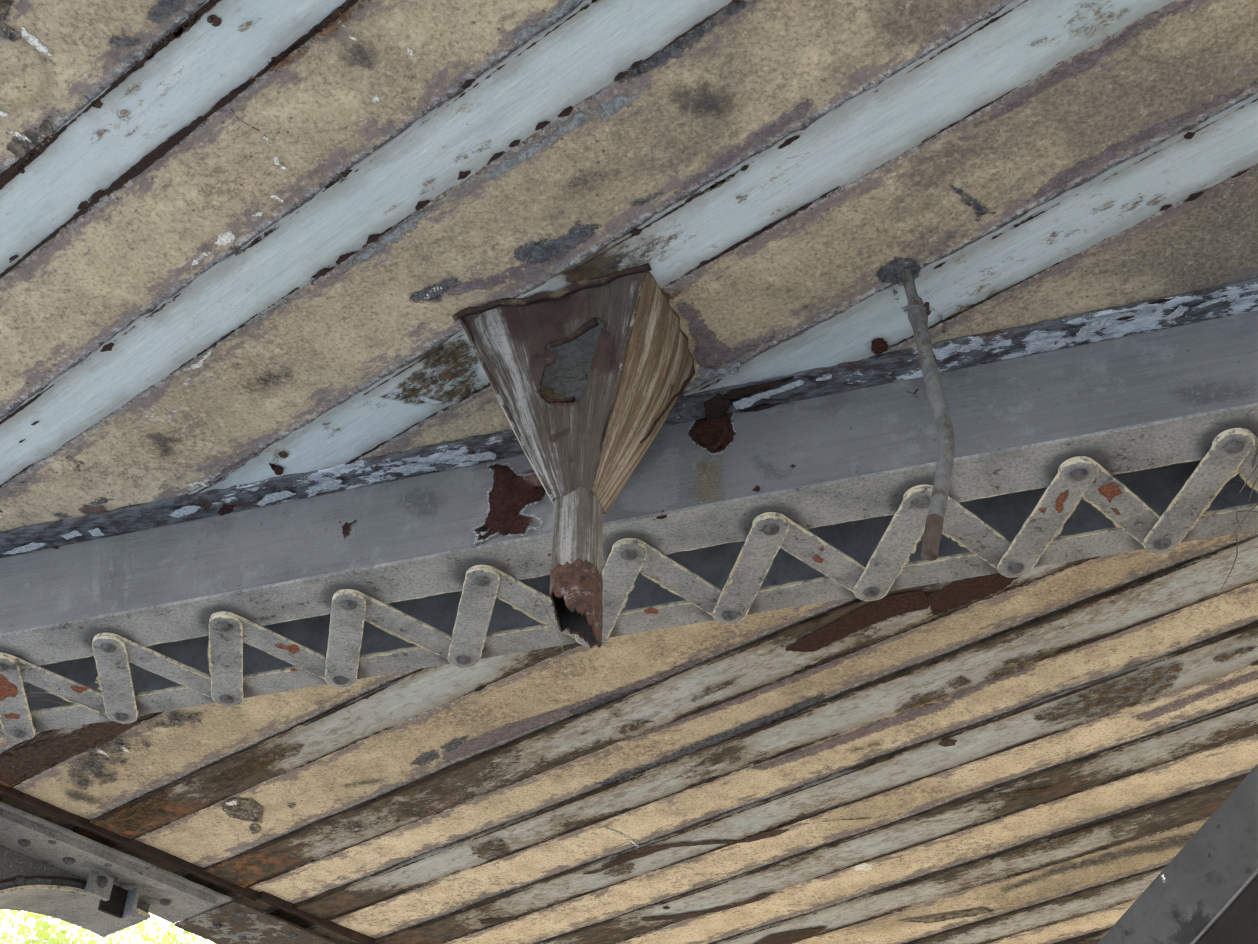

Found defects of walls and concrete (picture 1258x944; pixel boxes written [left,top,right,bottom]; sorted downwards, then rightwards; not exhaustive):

spalling [0,0,21,42]
spalling [7,116,54,160]
corrosion [0,0,375,279]
corrosion [171,139,521,374]
peeling [61,528,104,540]
peeling [169,505,201,518]
peeling [256,490,296,506]
corrosion [618,556,1101,734]
corrosion [873,552,1258,688]
corrosion [0,674,839,944]
corrosion [409,625,1258,944]
spalling [901,907,995,923]